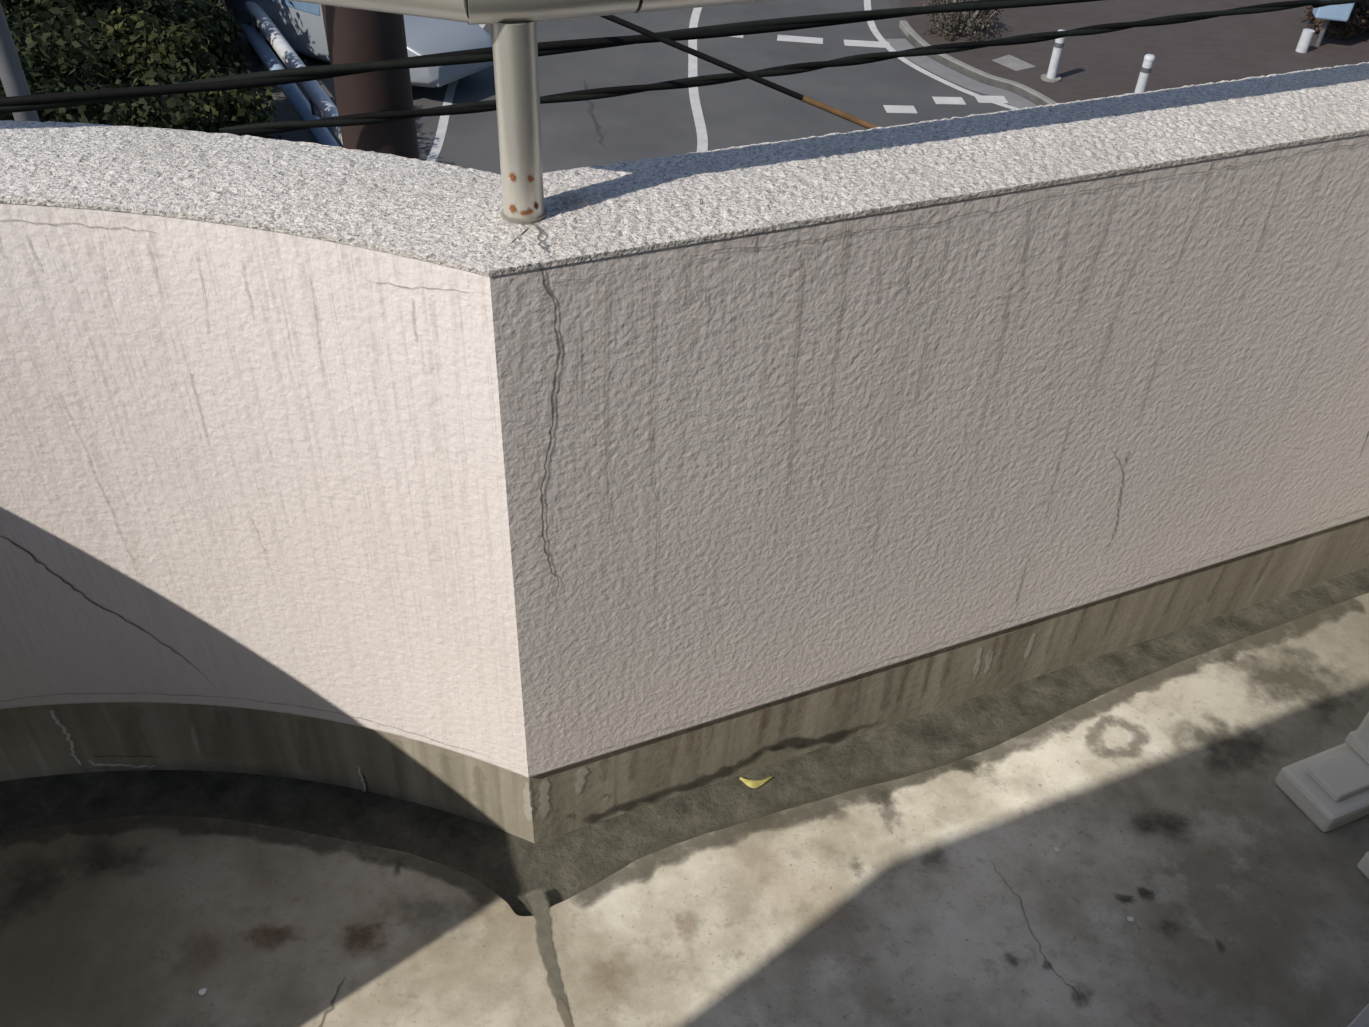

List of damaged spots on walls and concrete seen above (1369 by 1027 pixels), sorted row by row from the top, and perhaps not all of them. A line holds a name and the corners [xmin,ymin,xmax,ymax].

crack [531,223,561,586]
crack [0,536,211,683]
leakage [49,710,158,768]
leakage [0,807,494,906]
leakage [524,780,549,819]
leakage [575,598,1363,905]
crack [318,978,345,1027]
crack [526,889,573,1027]